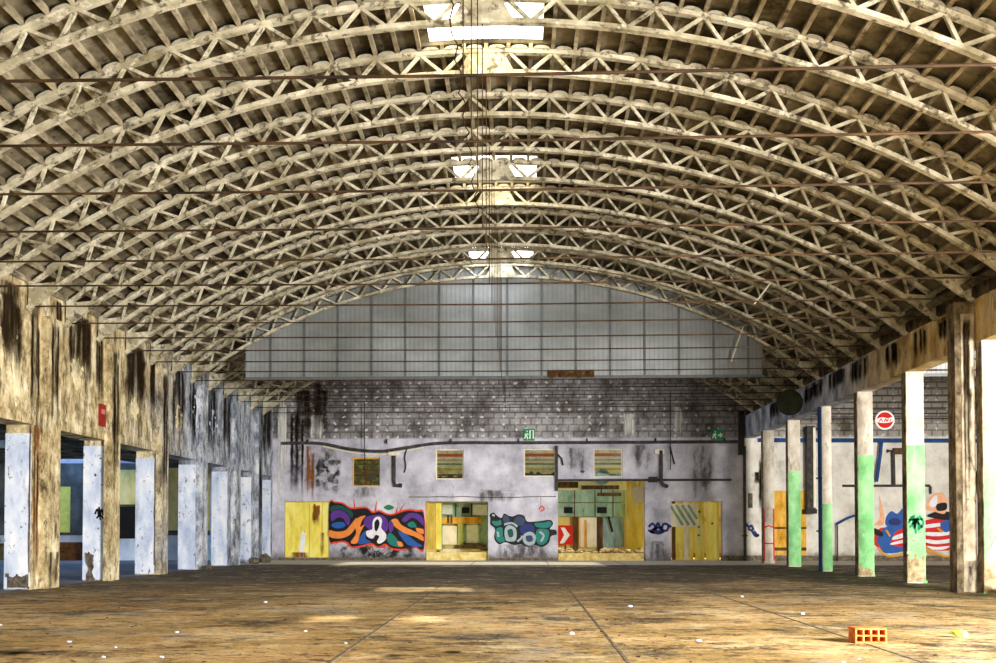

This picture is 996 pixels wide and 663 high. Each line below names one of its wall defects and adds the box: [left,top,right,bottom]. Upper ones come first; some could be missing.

leakage [937,317,947,337]
leakage [0,282,40,407]
leakage [886,342,900,366]
leakage [52,302,231,476]
leakage [259,384,327,530]
leakage [316,455,339,485]
peeling [984,560,996,594]